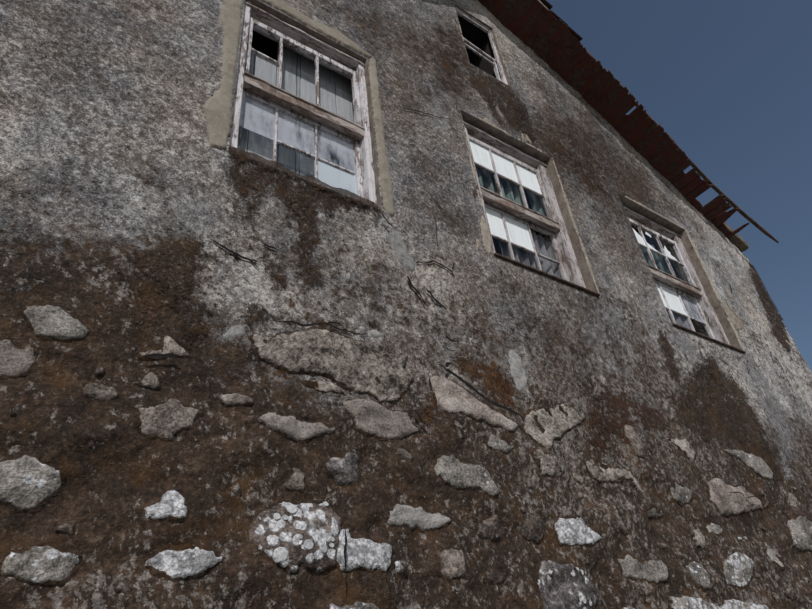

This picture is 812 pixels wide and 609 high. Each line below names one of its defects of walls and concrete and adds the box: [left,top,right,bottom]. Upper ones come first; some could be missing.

water stain [226,161,271,221]
crack [212,239,277,270]
water stain [266,259,287,296]
water stain [286,197,327,292]
crack [272,320,368,335]
spalling [224,325,422,444]
crack [438,362,527,423]
spalling [429,374,586,479]
spalling [0,451,67,514]
spalling [143,489,190,524]
spalling [144,543,227,582]
spalling [246,498,408,579]